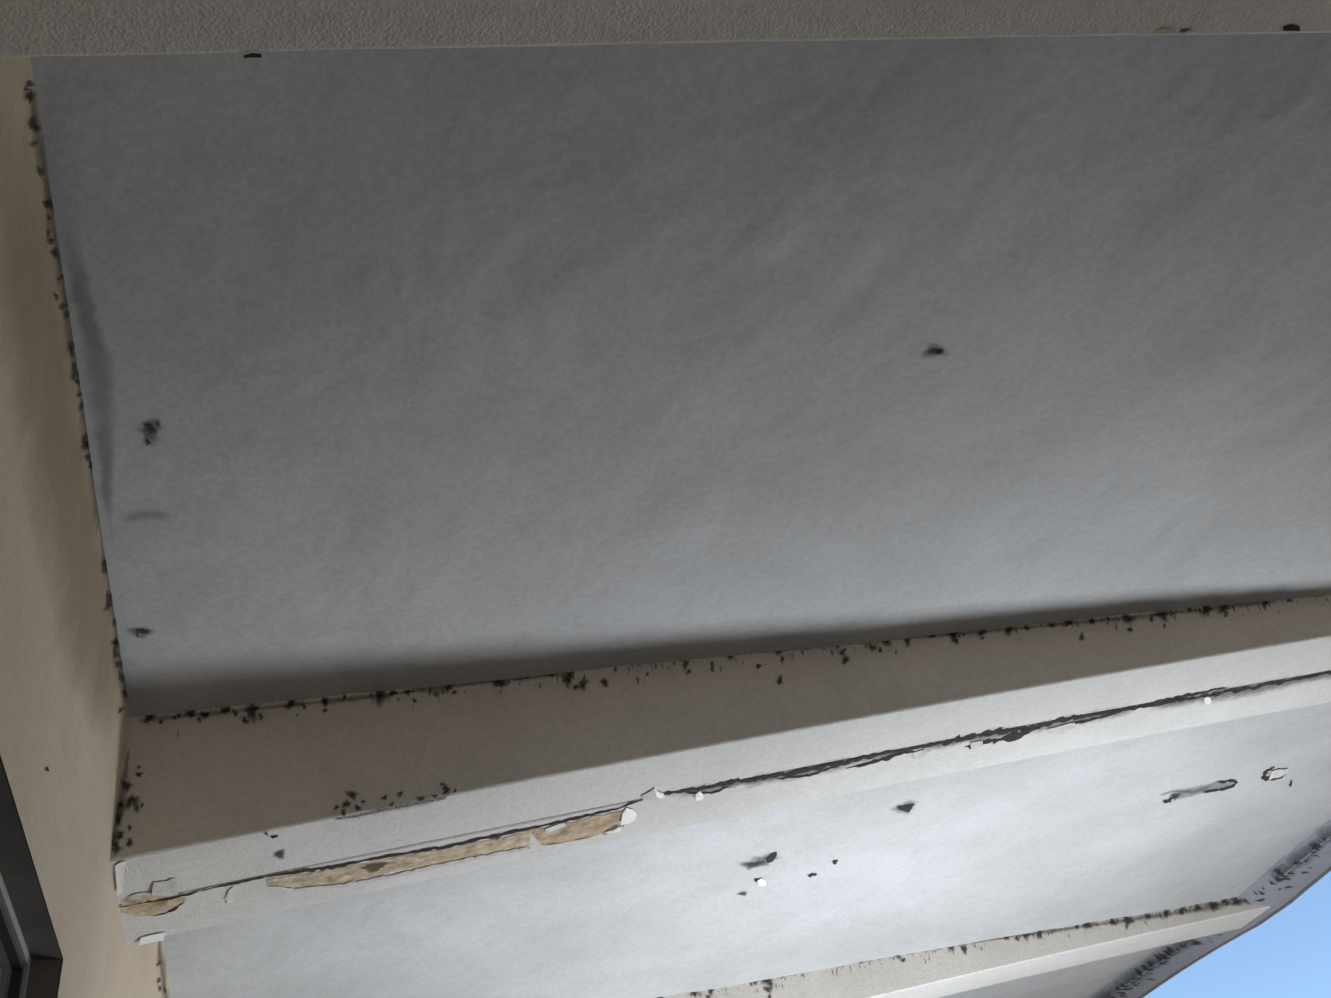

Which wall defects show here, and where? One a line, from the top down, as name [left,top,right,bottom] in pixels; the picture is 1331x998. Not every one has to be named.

crack [119,671,1331,908]
peeling [1162,780,1238,803]
peeling [1261,767,1292,787]
spalling [266,808,637,892]
spalling [115,861,186,917]
peeling [138,932,165,946]